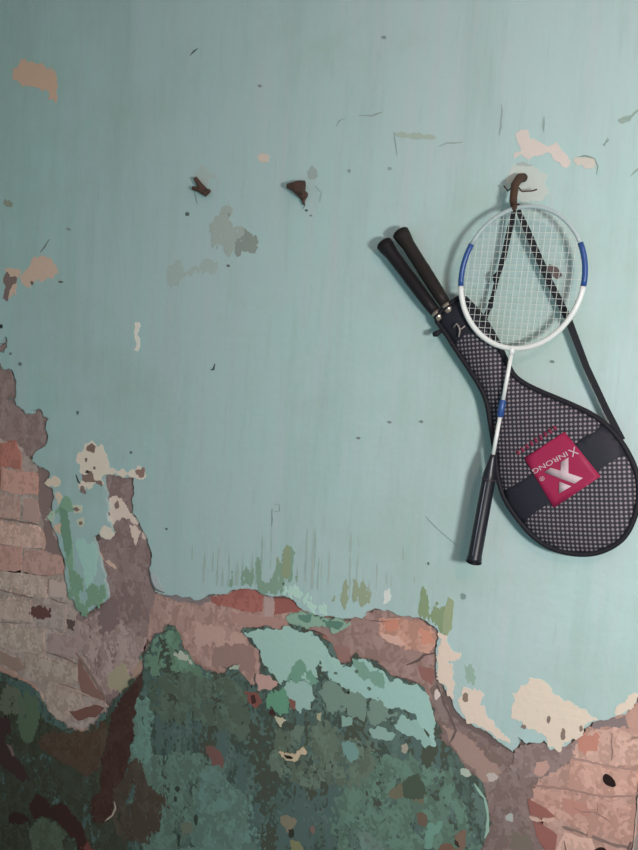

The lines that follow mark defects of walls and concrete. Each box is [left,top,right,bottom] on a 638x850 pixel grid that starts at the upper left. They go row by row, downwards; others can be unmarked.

peeling [12,59,58,103]
peeling [506,129,596,203]
peeling [3,255,59,301]
peeling [76,441,146,494]
flaking render [0,365,105,731]
damp [0,495,490,850]
peeling [144,572,638,850]
crack [571,733,638,771]
flaking render [8,793,92,850]
crack [532,785,636,850]